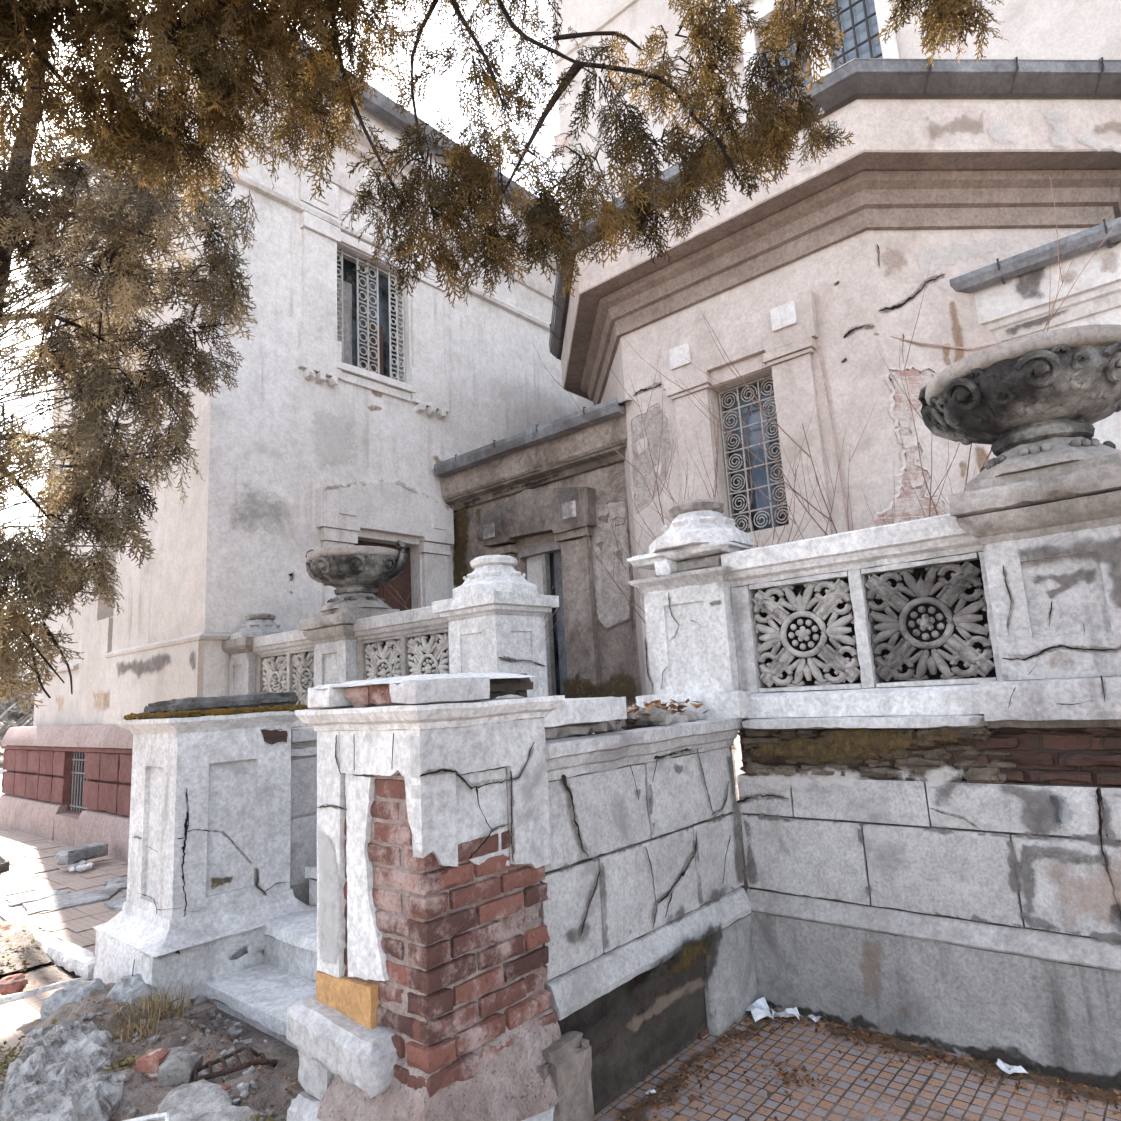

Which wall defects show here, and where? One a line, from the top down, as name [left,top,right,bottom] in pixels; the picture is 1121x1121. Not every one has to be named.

crack [843,274,944,381]
spalling [869,365,947,528]
peeling [591,401,675,631]
crack [1002,566,1121,709]
crack [132,791,285,916]
crack [562,774,601,935]
crack [630,747,789,929]
crack [1096,788,1121,920]
damp [592,1021,704,1113]
damp [584,925,723,1058]
damp [798,1007,878,1029]
damp [894,1029,1121,1091]